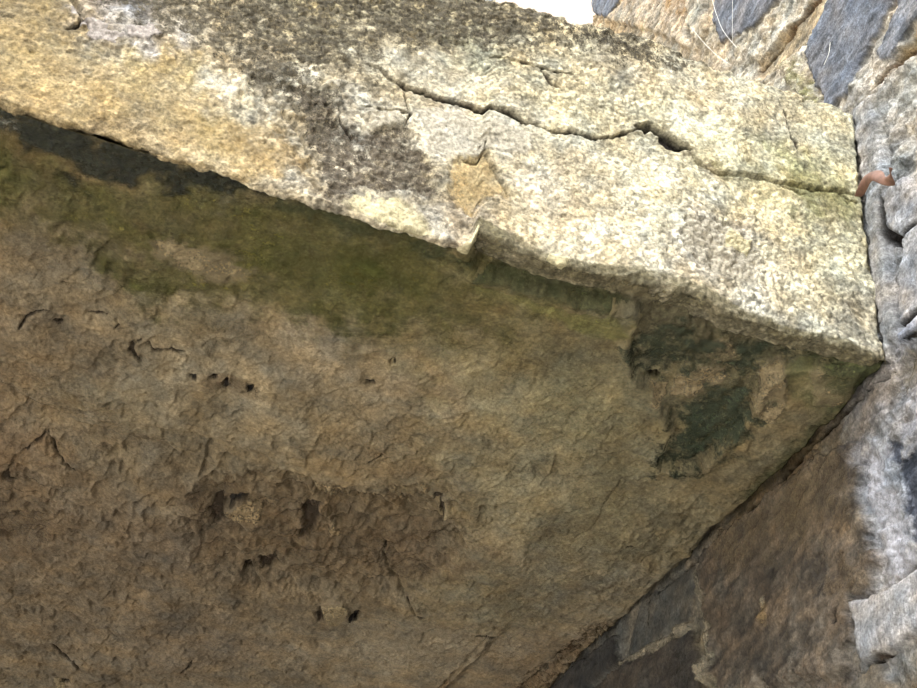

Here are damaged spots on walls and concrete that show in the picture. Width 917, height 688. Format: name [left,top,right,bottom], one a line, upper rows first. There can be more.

leakage [97,0,704,139]
crack [520,62,566,88]
crack [395,83,527,126]
crack [555,127,685,153]